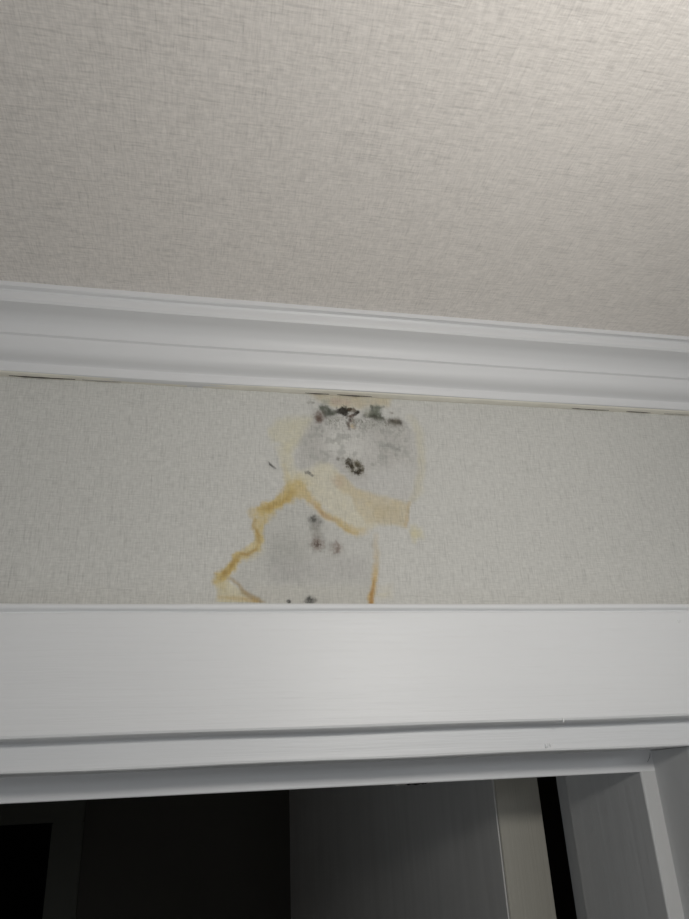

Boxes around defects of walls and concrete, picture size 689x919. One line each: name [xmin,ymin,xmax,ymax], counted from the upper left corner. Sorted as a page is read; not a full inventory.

water stain [209,394,429,604]